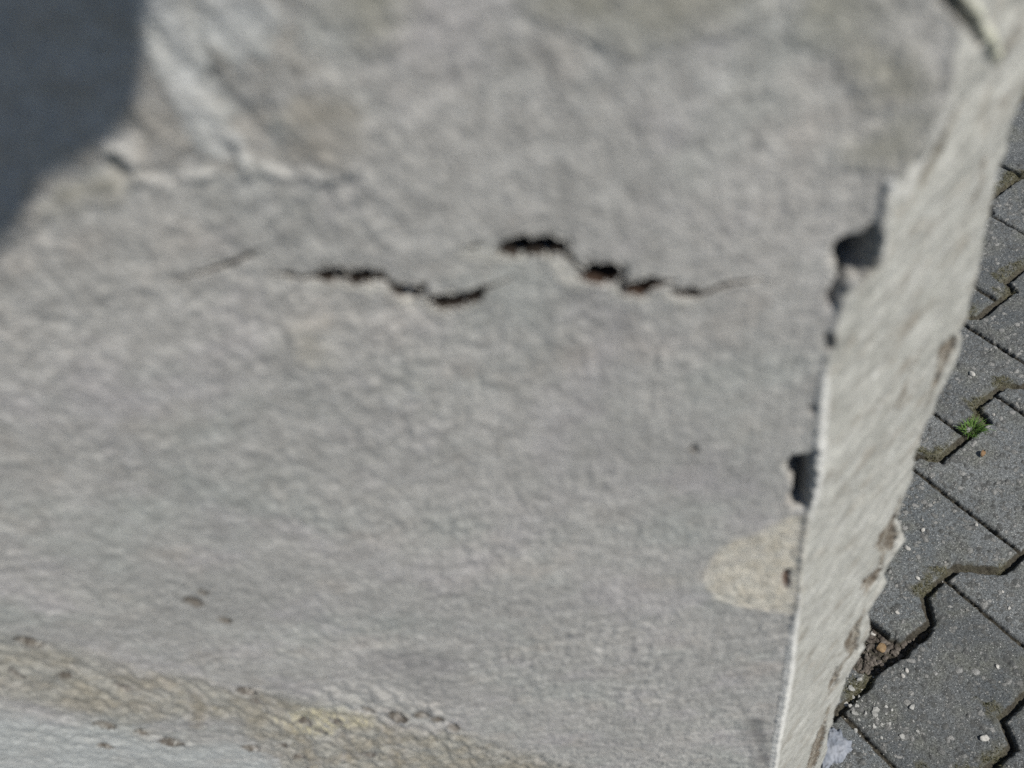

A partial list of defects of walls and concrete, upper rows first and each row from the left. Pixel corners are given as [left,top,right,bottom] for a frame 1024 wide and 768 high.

crack [174,230,776,317]
spalling [821,220,886,309]
peeling [822,333,838,352]
peeling [699,450,820,617]